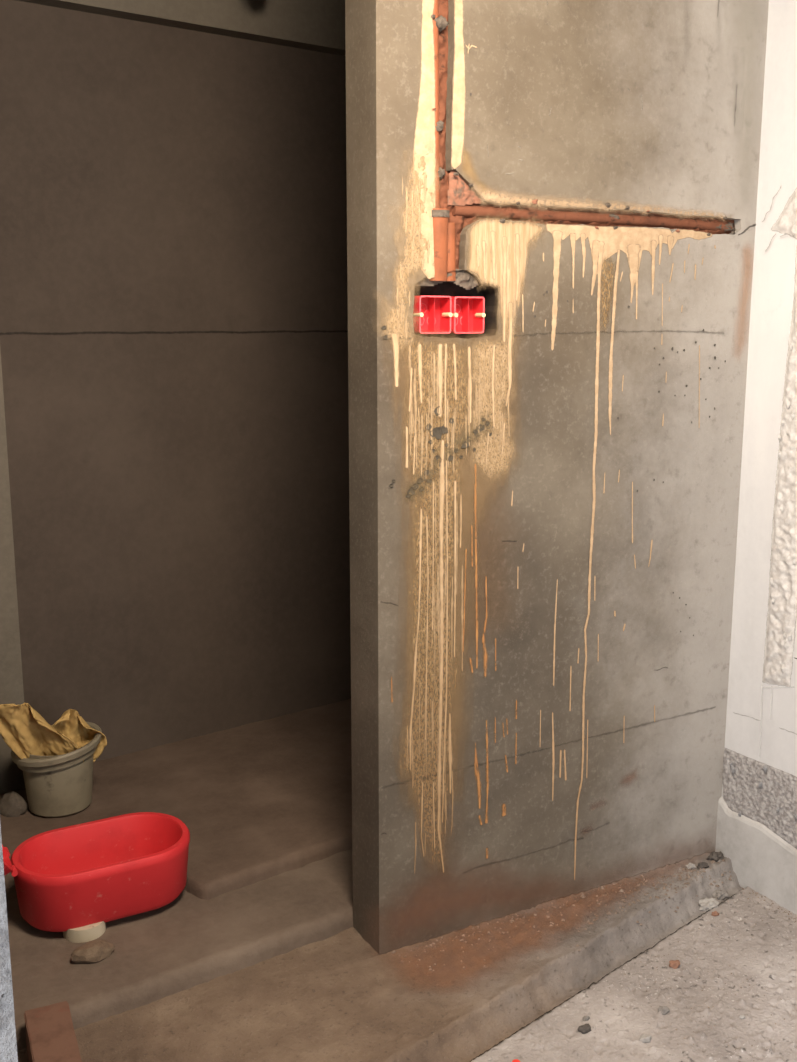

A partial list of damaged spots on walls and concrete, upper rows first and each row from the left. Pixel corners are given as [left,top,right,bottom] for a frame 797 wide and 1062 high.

corrosion [400,883,633,984]